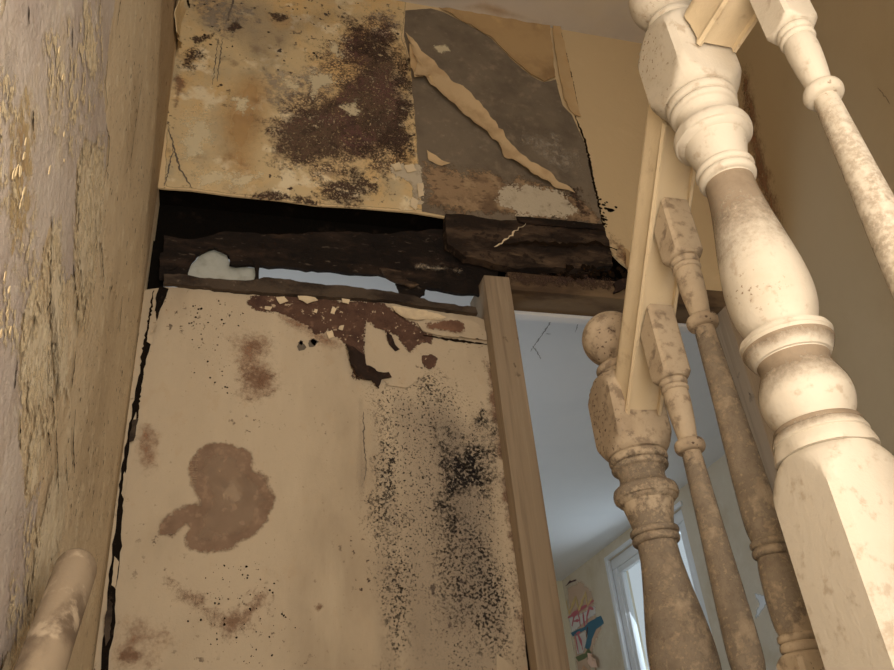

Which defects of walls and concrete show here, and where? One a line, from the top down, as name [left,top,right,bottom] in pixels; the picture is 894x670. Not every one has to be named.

crack [212,0,234,85]
leakage [232,3,415,208]
flaking render [138,8,602,302]
crack [46,265,87,492]
peeling [0,0,138,670]
crack [140,290,154,366]
peeling [247,295,446,389]
spalling [537,256,628,282]
leakage [159,443,275,553]
leakage [367,376,514,667]